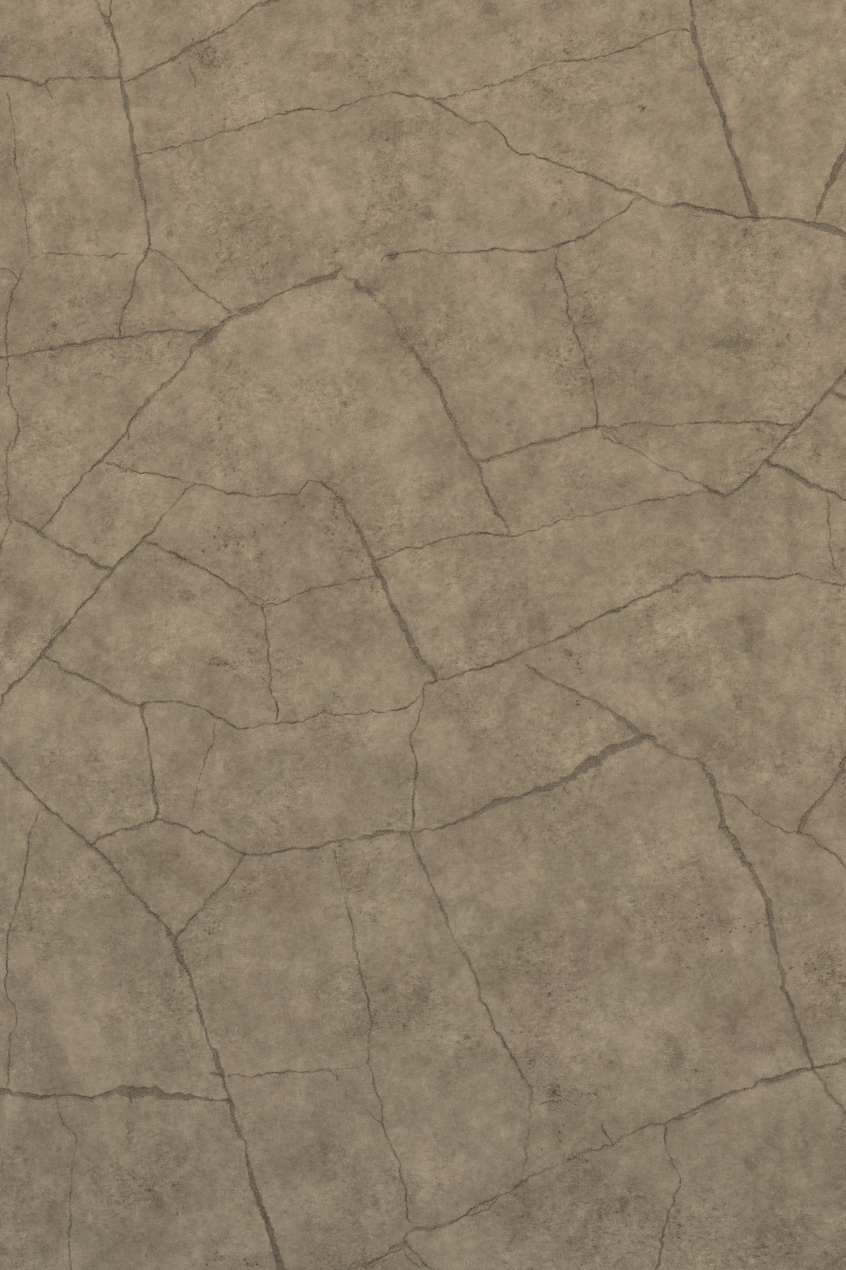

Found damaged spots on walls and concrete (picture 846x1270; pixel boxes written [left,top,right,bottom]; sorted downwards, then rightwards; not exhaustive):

crack [104,12,119,49]
crack [120,81,151,245]
crack [691,24,758,220]
crack [792,152,846,236]
crack [293,274,360,292]
crack [418,357,446,408]
crack [704,397,827,497]
crack [2,521,186,699]
crack [119,695,314,856]
crack [350,532,665,863]
crack [0,766,285,1270]
crack [740,858,846,1072]